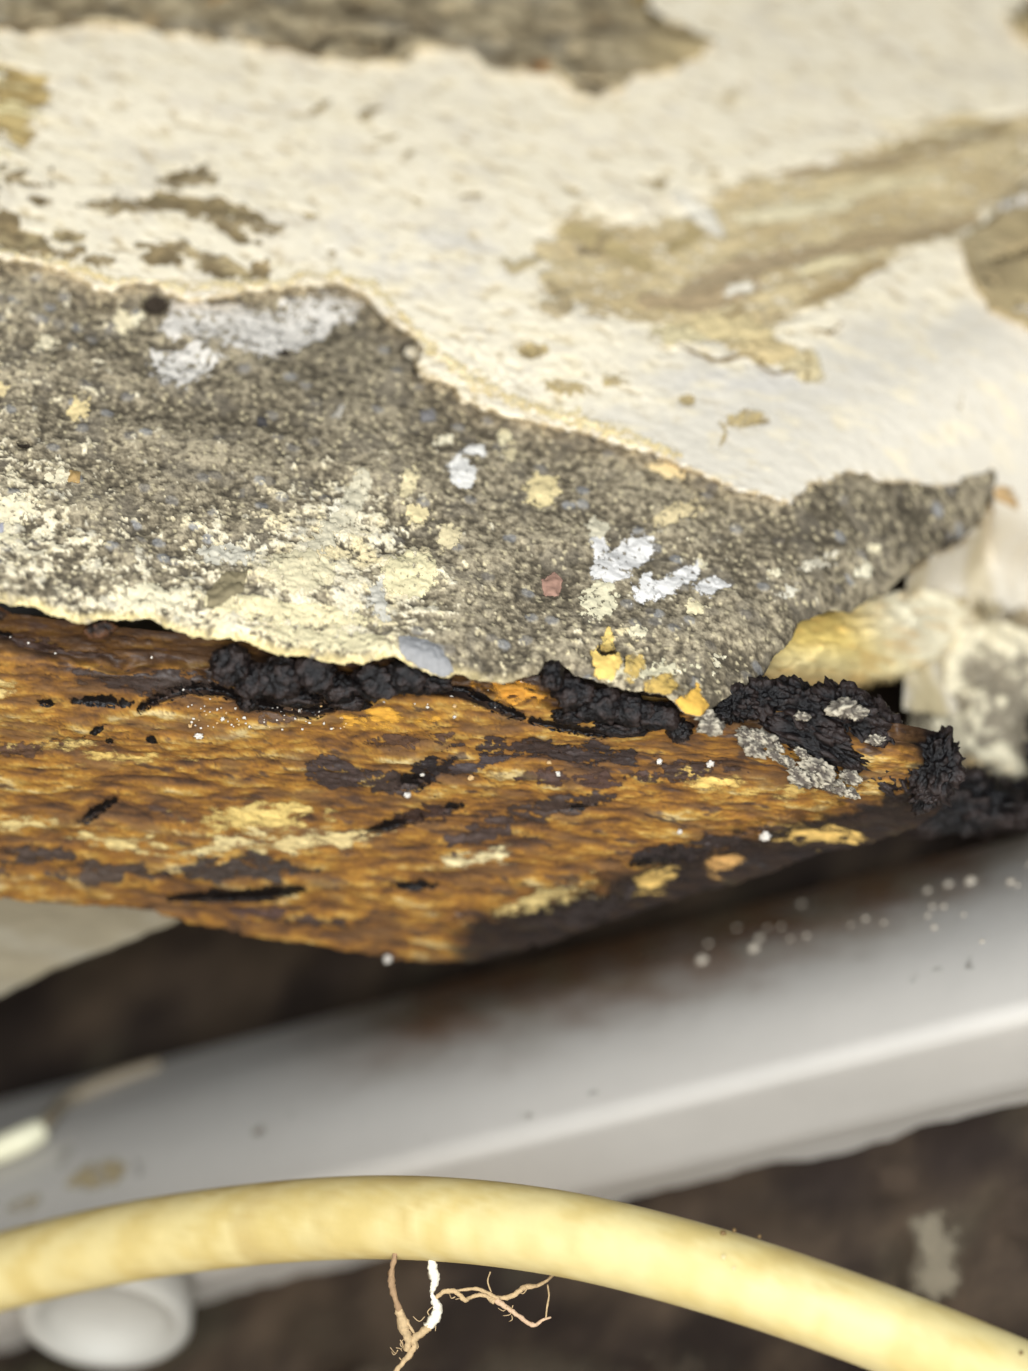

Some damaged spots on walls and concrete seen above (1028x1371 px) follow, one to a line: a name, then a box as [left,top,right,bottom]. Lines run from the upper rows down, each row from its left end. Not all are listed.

peeling [0,0,1028,740]
rust [82,620,118,640]
rust [208,643,454,713]
rust [380,626,1028,1038]